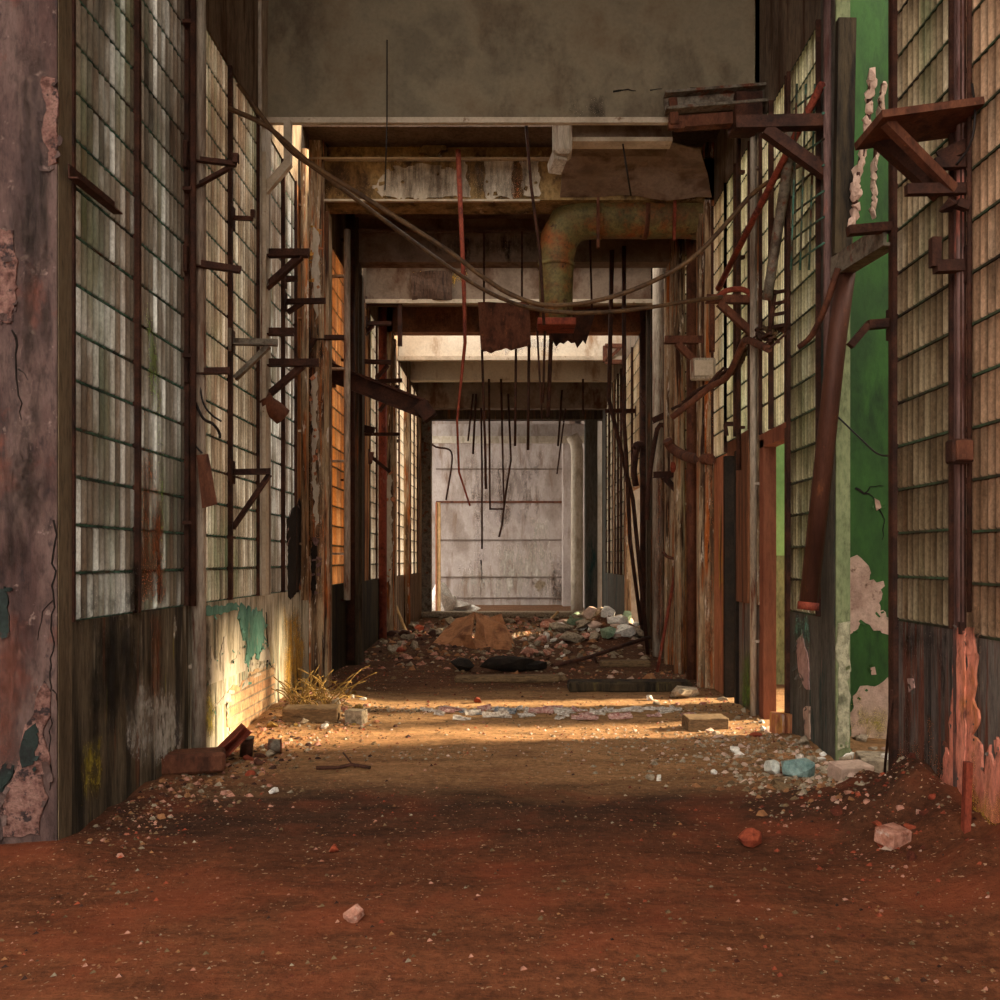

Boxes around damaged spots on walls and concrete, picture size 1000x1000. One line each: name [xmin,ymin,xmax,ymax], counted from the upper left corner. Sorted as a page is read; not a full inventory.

flaking render [36,76,63,172]
flaking render [0,226,19,325]
crack [11,330,28,420]
corrosion [142,457,165,601]
peeling [0,586,13,639]
flaking render [0,681,53,841]
crack [37,520,57,790]
efflorescence [128,687,180,760]
flaking render [206,602,275,734]
peeling [827,555,888,781]
peeling [940,625,1000,824]